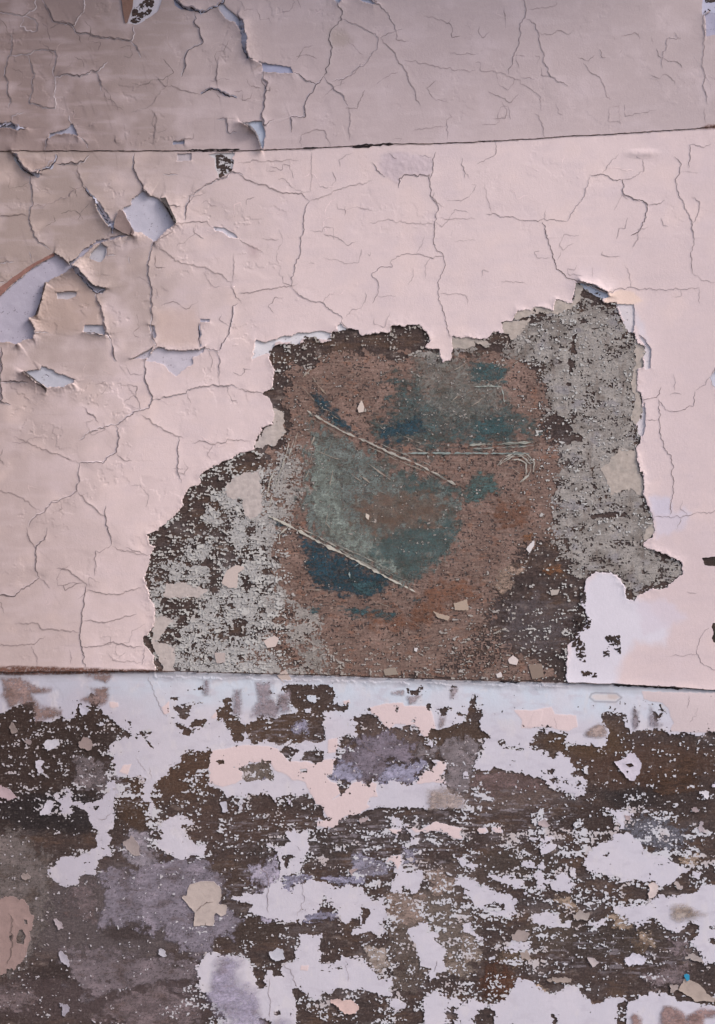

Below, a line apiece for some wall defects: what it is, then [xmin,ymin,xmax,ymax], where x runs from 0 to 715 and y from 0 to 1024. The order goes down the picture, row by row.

peeling [0,190,176,344]
peeling [242,121,266,151]
crack [0,0,715,714]
peeling [0,283,715,1024]